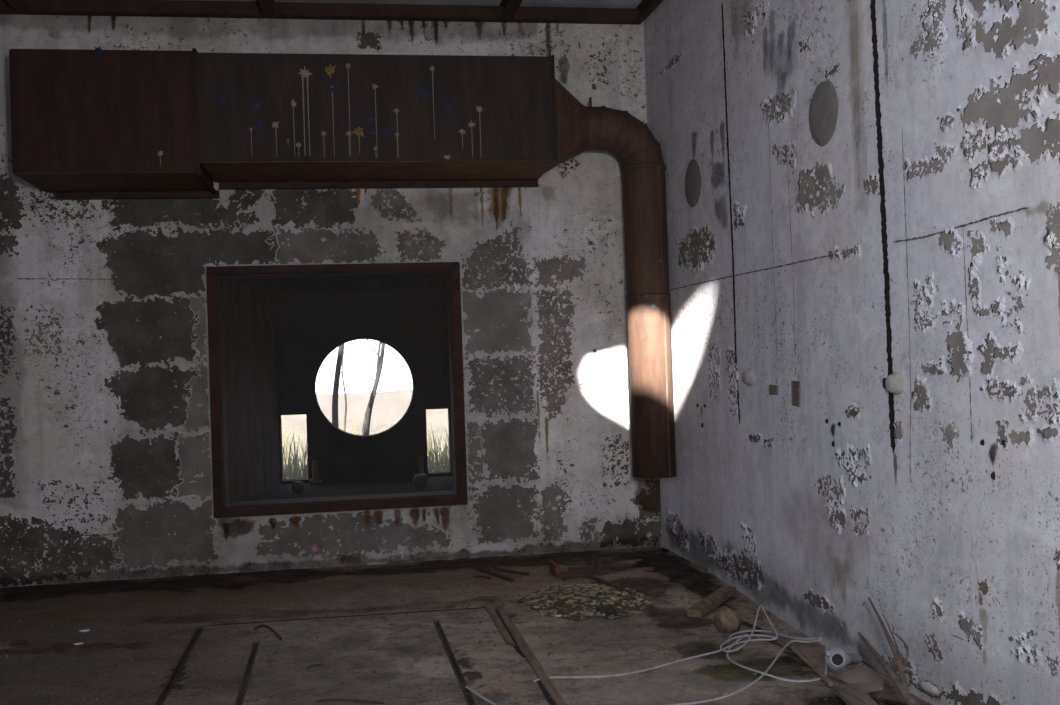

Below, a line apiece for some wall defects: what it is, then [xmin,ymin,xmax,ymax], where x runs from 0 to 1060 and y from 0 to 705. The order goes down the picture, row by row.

peeling [760,85,797,127]
peeling [903,0,1060,190]
rust [480,188,522,229]
peeling [557,157,581,179]
peeling [771,139,846,219]
peeling [862,172,880,197]
peeling [1043,201,1060,280]
peeling [911,216,1060,451]
peeling [0,172,453,588]
peeling [459,223,766,593]
rust [364,508,449,530]
peeling [813,443,873,538]